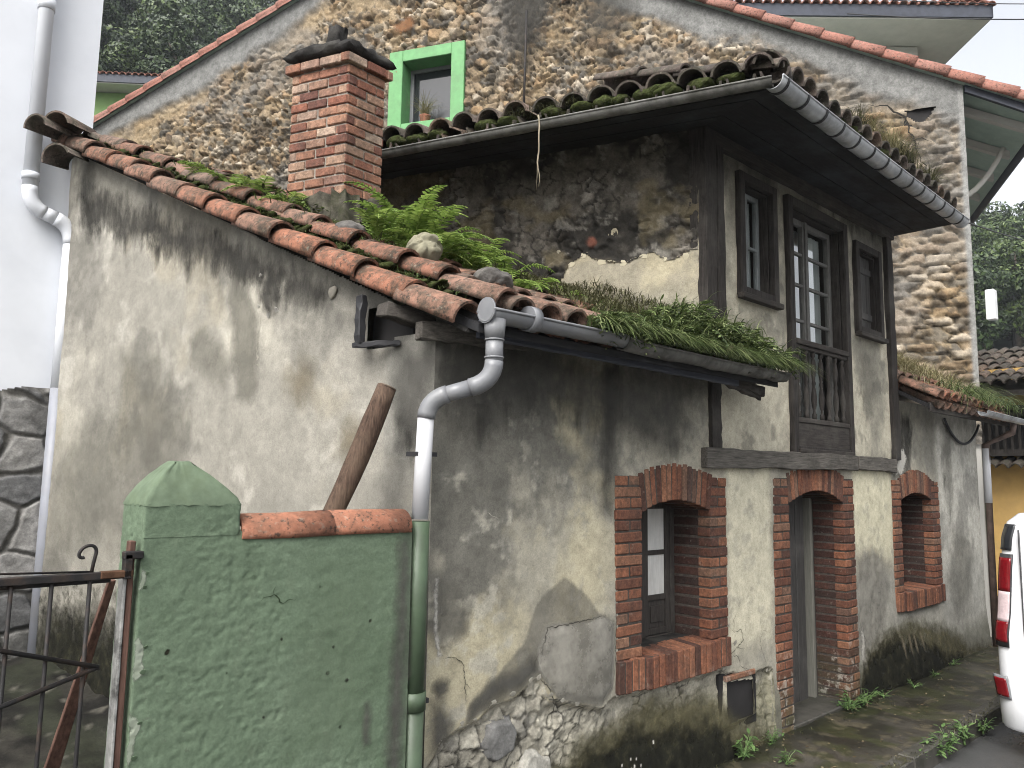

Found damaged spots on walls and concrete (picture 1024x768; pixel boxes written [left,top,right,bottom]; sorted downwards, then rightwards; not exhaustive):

spalling [380,130,700,283]
water stain [81,191,325,397]
water stain [861,631,963,700]
spalling [427,666,778,768]
water stain [572,718,741,768]